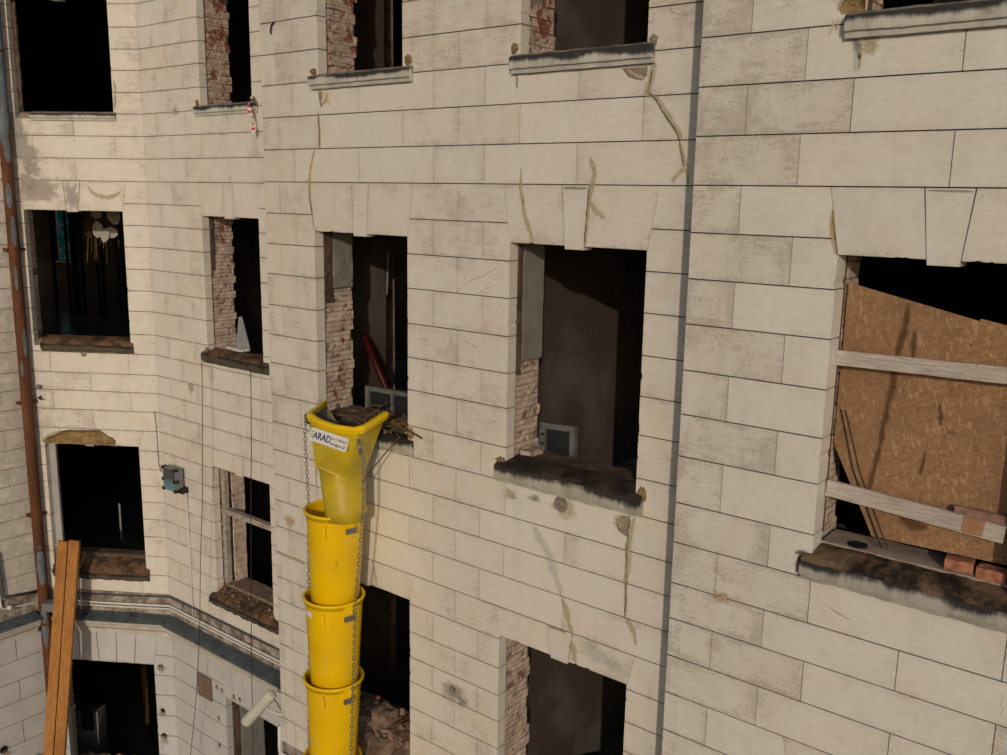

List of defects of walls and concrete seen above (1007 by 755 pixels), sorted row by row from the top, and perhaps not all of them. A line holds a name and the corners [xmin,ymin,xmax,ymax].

spalling [830,0,865,32]
crack [308,114,320,226]
crack [646,63,689,182]
spalling [42,430,116,447]
crack [624,516,634,616]